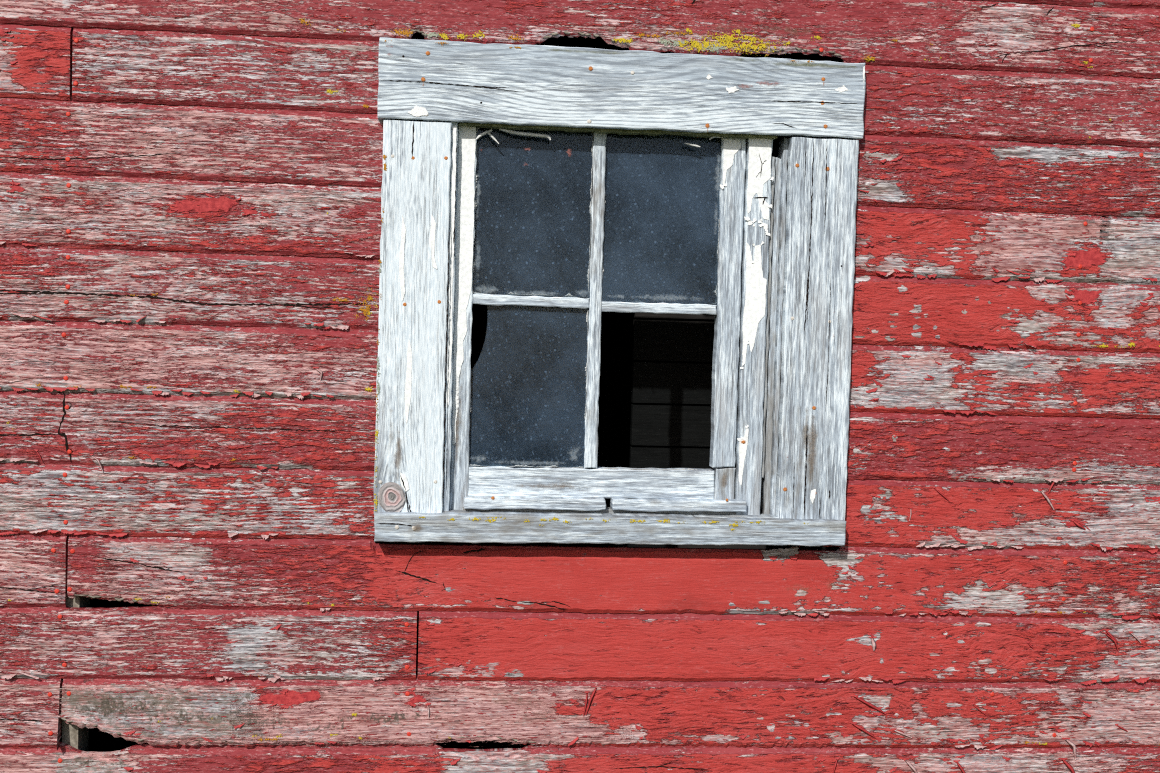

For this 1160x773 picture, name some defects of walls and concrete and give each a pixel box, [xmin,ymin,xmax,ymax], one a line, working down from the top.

peeling [986,143,1058,162]
peeling [858,182,904,202]
peeling [684,136,774,369]
peeling [854,236,953,292]
crack [0,290,371,309]
peeling [849,304,947,405]
crack [0,392,359,461]
peeling [860,490,913,522]
peeling [916,451,1160,553]
peeling [815,547,861,590]
peeling [885,580,1030,643]
peeling [786,612,1160,773]